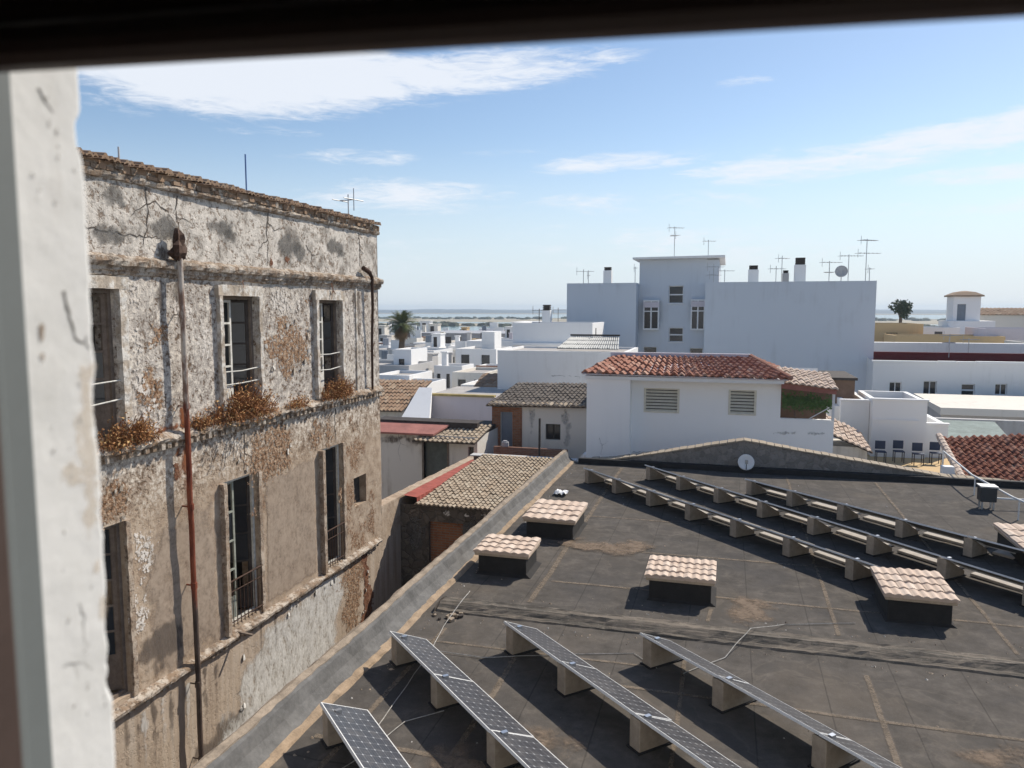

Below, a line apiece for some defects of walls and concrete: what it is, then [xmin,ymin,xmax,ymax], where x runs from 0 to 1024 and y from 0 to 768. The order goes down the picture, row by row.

crack [86,187,192,244]
spalling [256,286,314,381]
peeling [223,414,376,740]